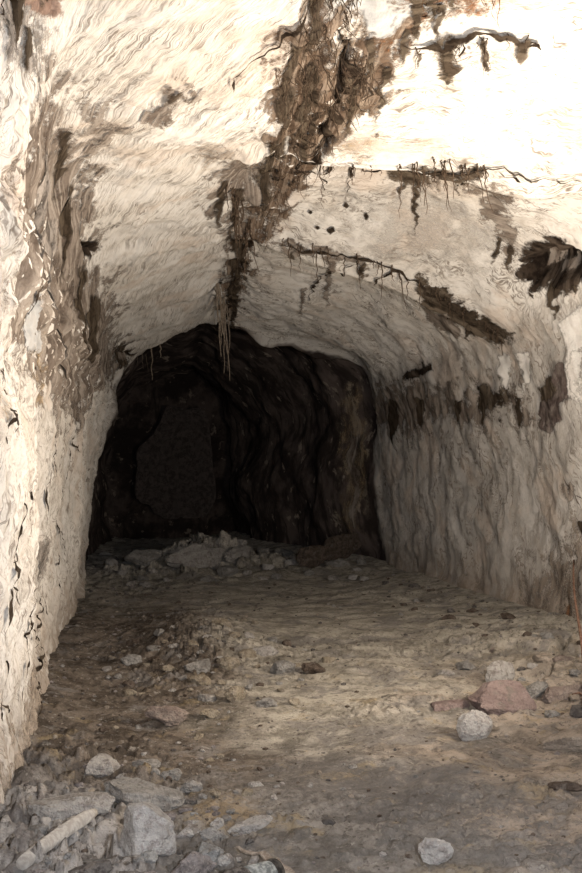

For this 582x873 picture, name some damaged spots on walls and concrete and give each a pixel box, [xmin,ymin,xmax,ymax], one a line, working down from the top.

leakage [433,35,464,86]
leakage [480,41,491,72]
leakage [516,39,531,65]
leakage [212,0,422,329]
leakage [397,171,441,230]
leakage [28,131,101,392]